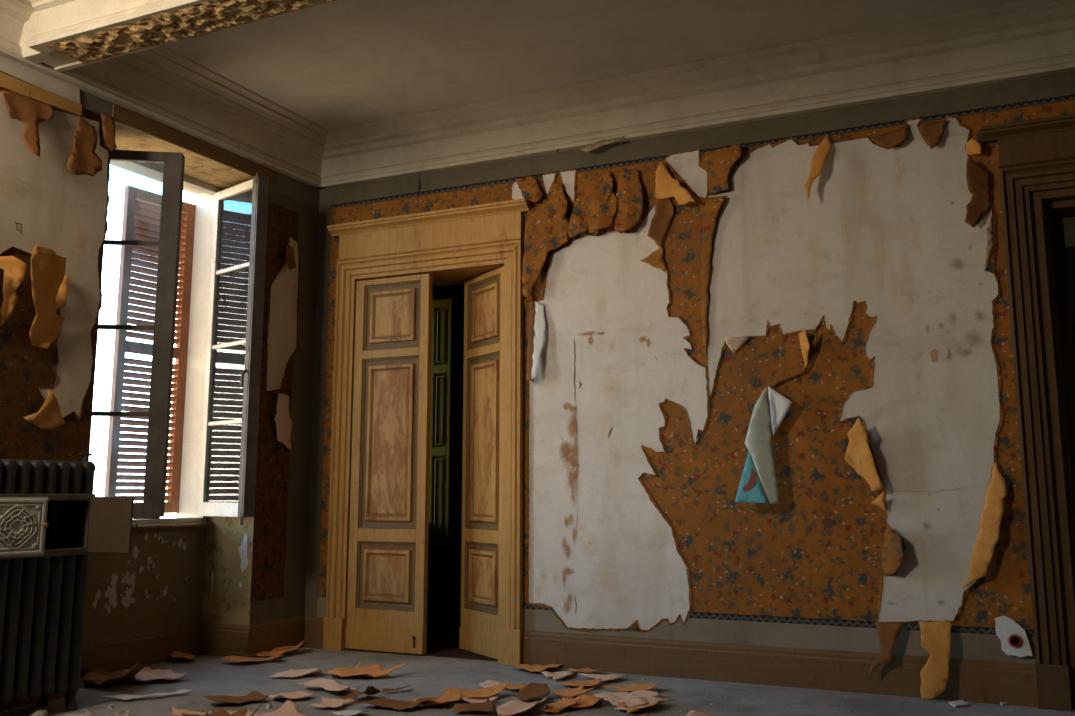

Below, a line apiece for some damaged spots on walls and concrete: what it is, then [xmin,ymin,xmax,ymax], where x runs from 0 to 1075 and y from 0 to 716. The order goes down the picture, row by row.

spalling [46,0,337,63]
peeling [0,55,116,430]
peeling [265,234,301,450]
peeling [511,115,1007,699]
peeling [93,532,187,613]
peeling [238,534,248,587]